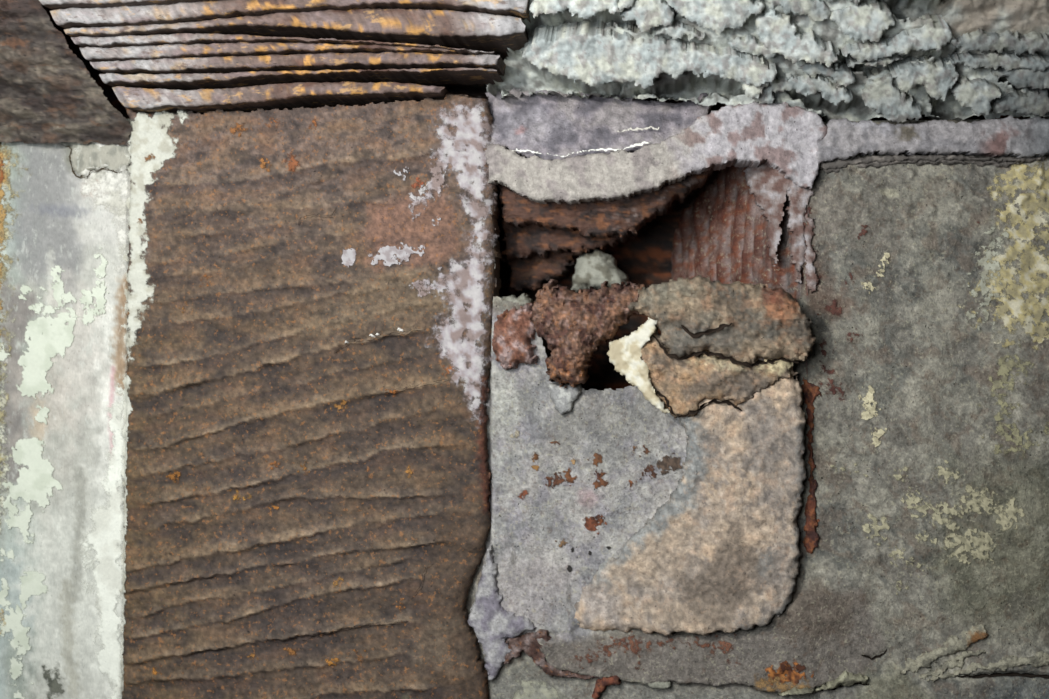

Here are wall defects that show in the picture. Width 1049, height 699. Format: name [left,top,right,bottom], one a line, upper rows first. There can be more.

rust [0,142,27,424]
peeling [0,247,109,425]
water stain [408,100,495,429]
rust [498,168,713,293]
peeling [607,317,670,414]
peeling [2,434,63,544]
rust [531,452,608,490]
rust [582,514,607,535]
rust [629,444,682,487]
peeling [0,571,48,699]
crack [816,649,887,691]
crack [957,671,1049,679]